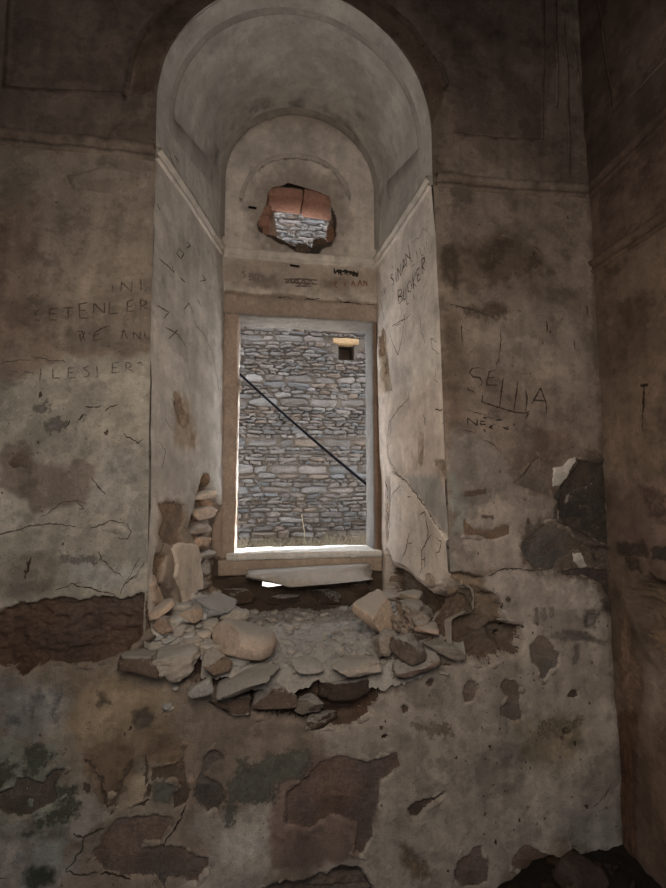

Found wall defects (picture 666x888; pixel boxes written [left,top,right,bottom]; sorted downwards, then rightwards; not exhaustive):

flaking render [257,223,295,251]
flaking render [308,208,337,254]
crack [0,477,132,540]
crack [385,394,441,587]
crack [55,535,164,594]
flaking render [0,486,221,676]
spalling [184,660,228,691]
spalling [244,679,380,731]
crack [65,802,131,880]
peeling [82,741,230,888]
crack [163,805,186,845]
peeling [257,752,400,888]